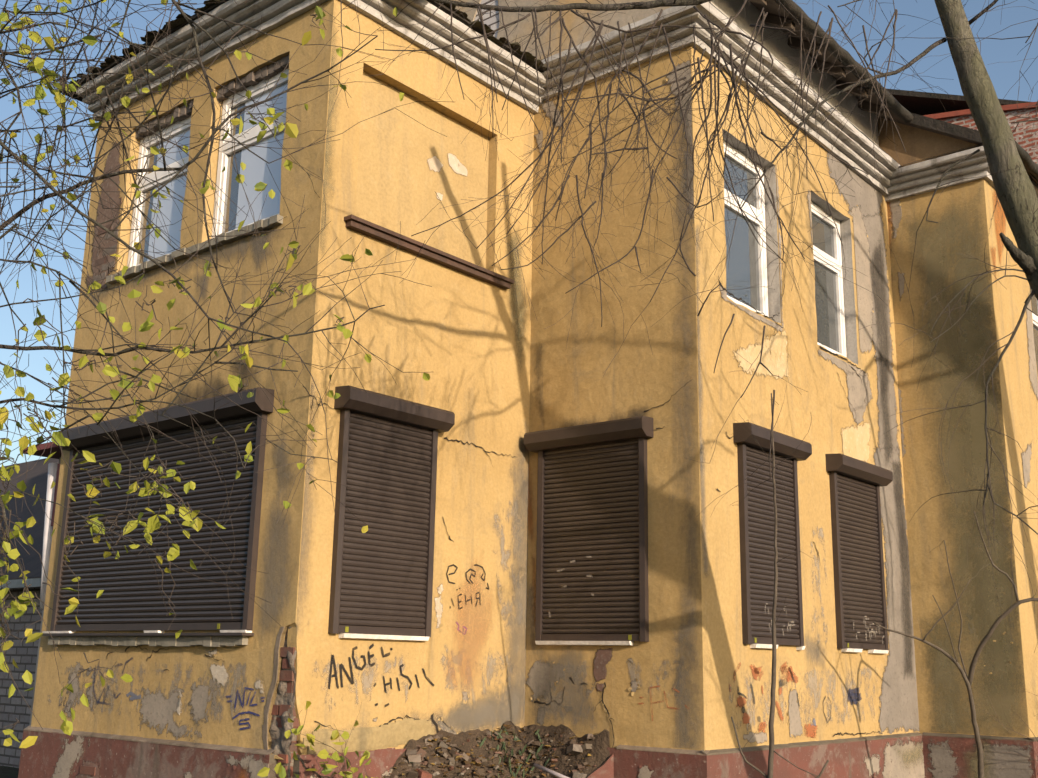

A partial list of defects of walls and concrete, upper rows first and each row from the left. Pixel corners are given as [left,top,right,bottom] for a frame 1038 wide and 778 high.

peeling [427,153,468,176]
peeling [720,165,789,380]
peeling [818,153,959,778]
water stain [871,246,912,672]
water stain [910,206,1025,734]
peeling [52,736,101,778]
peeling [61,662,115,717]
spalling [139,627,299,778]
peeling [788,688,803,738]
peeling [974,743,1034,778]